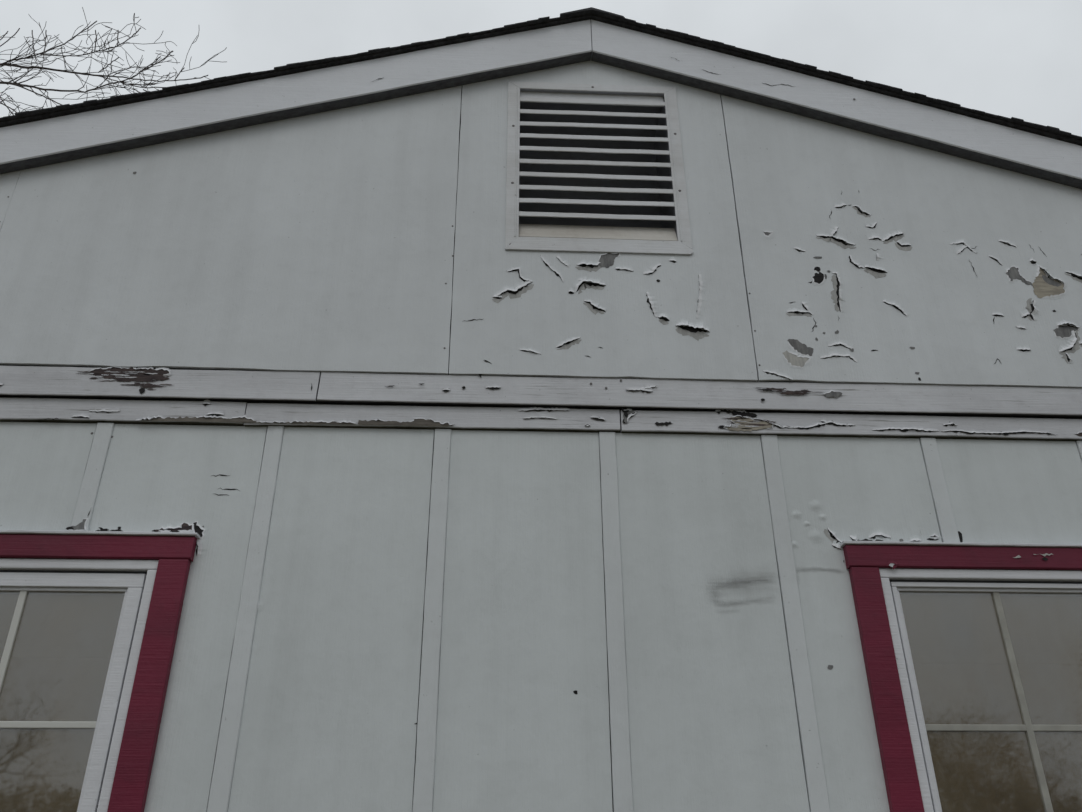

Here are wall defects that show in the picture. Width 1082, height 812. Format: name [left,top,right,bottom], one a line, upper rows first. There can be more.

peeling [575,252,622,272]
peeling [794,246,831,286]
peeling [1004,257,1067,300]
peeling [782,339,814,369]
peeling [1054,319,1082,364]
peeling [76,366,172,394]
peeling [758,388,842,401]
peeling [134,415,455,426]
peeling [715,409,795,431]
peeling [66,509,122,531]
peeling [152,519,209,558]
peeling [849,528,942,542]